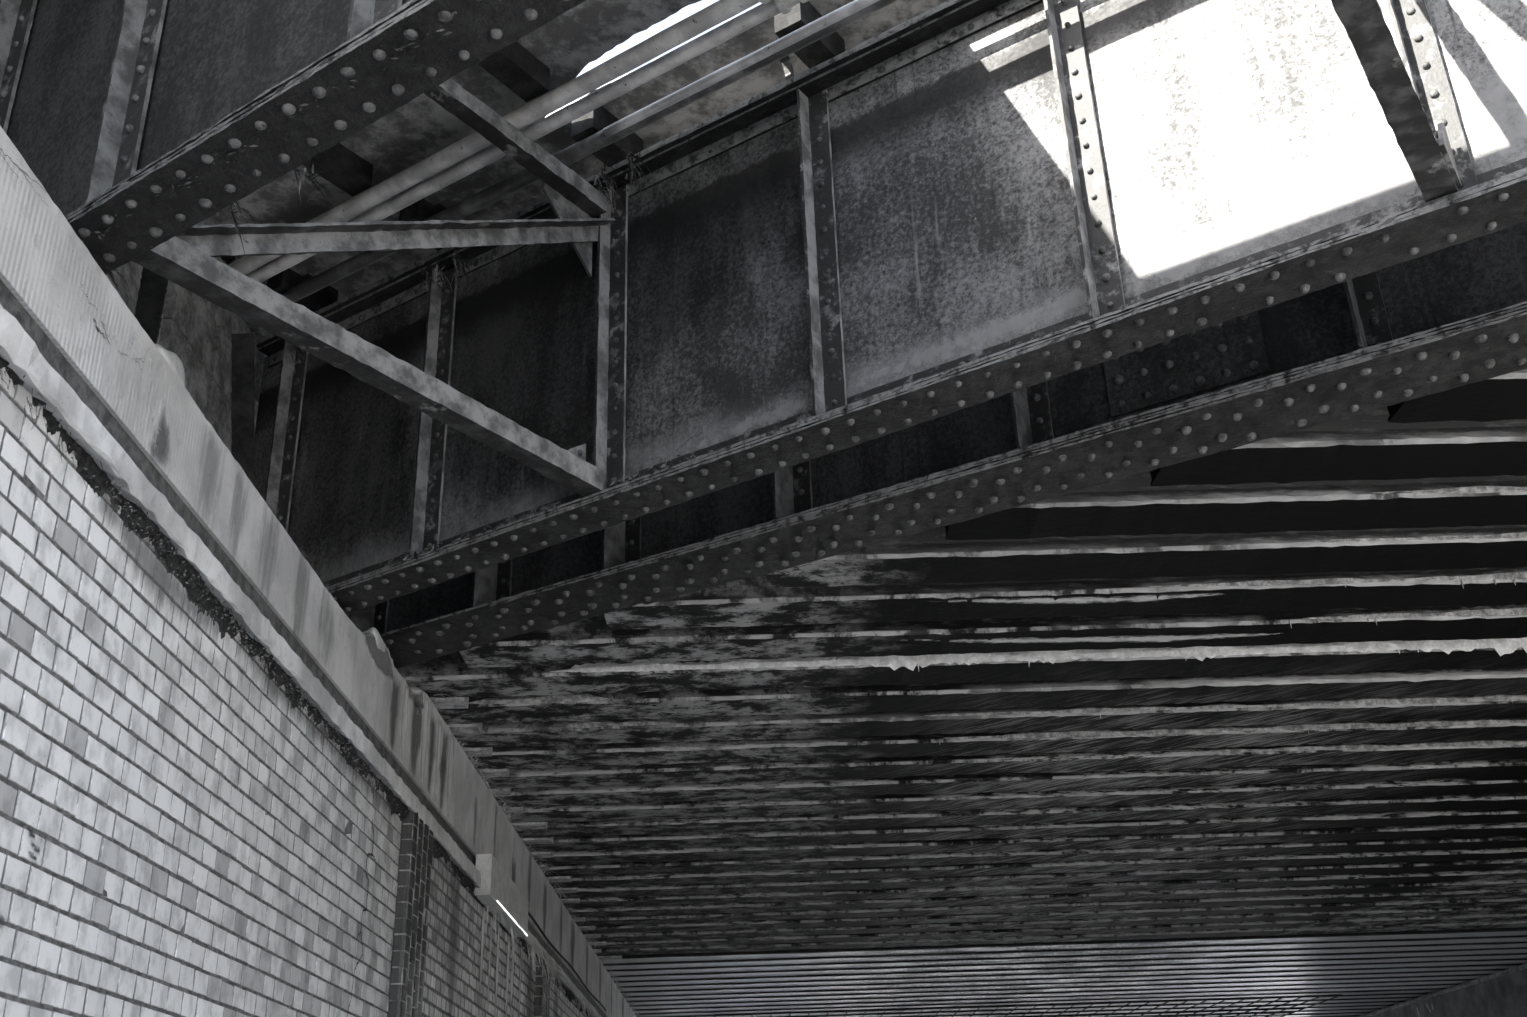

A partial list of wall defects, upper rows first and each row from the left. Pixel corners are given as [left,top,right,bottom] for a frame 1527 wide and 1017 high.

leakage [1314,531,1527,542]
leakage [949,569,1527,603]
leakage [550,604,1527,673]
leakage [468,693,611,704]
leakage [565,719,670,728]